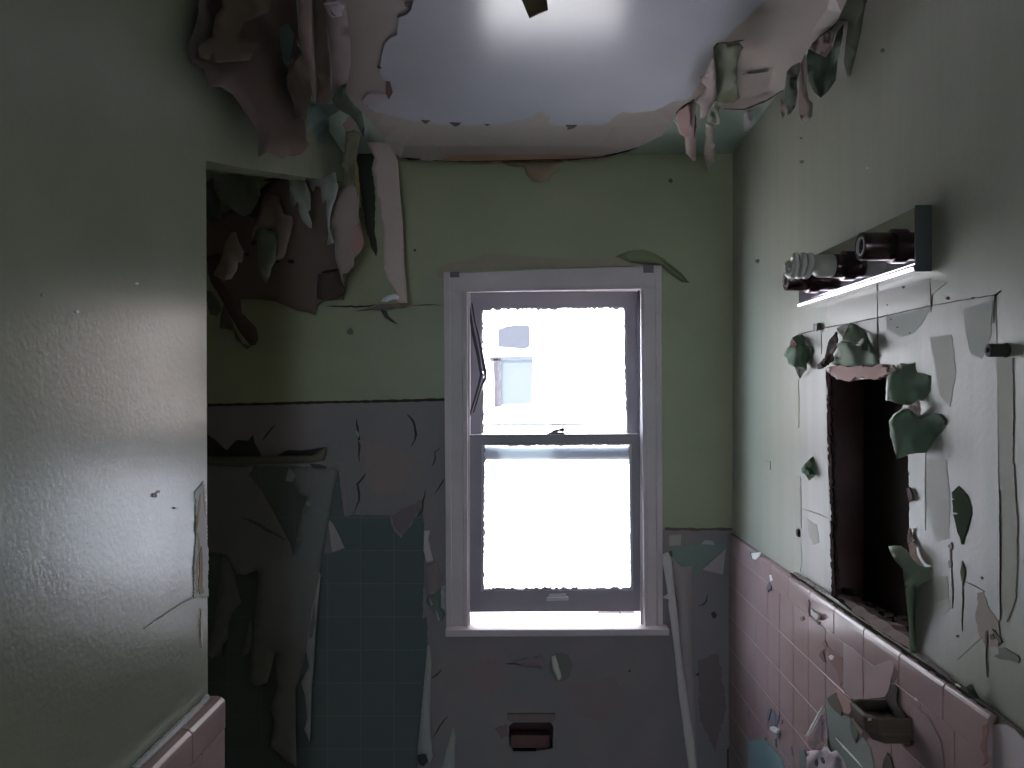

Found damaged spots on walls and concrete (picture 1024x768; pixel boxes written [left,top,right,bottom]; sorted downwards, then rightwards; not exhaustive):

peeling [188,0,345,159]
peeling [358,142,412,311]
spalling [193,481,209,598]
crack [353,419,366,514]
crack [407,414,445,516]
peeling [800,296,1002,660]